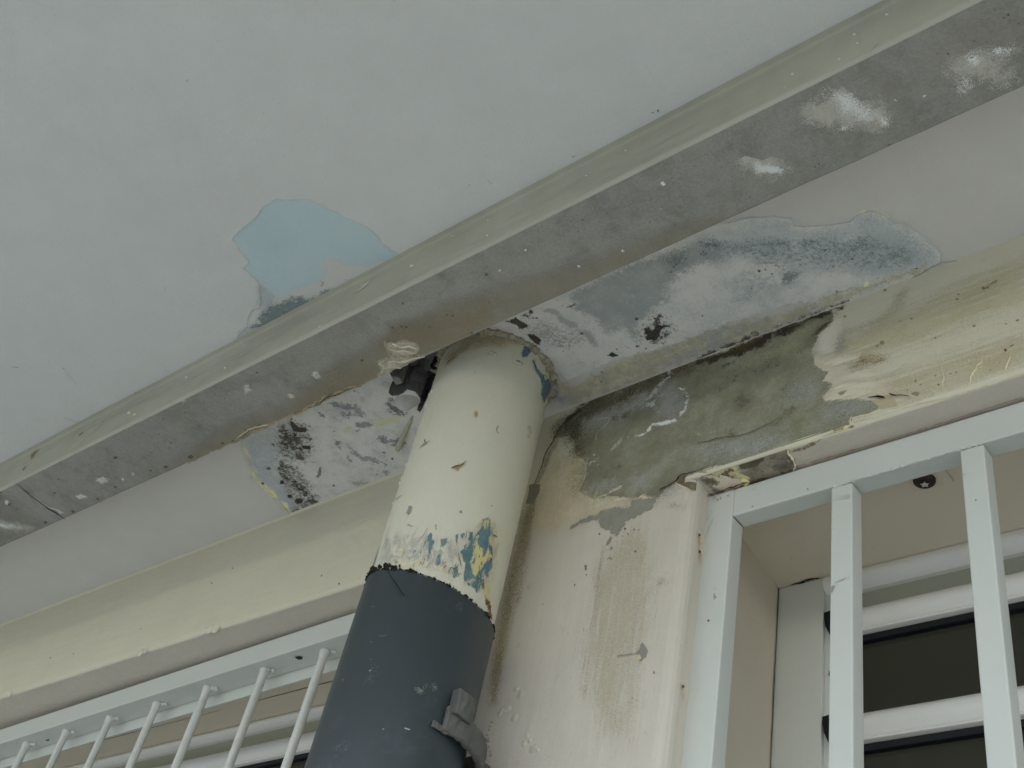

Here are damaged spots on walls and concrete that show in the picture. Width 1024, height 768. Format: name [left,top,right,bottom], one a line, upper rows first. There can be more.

water stain [733,6,1024,199]
peeling [232,198,399,305]
peeling [188,325,447,515]
water stain [96,202,1024,708]
spalling [506,206,1024,560]
water stain [563,514,669,754]